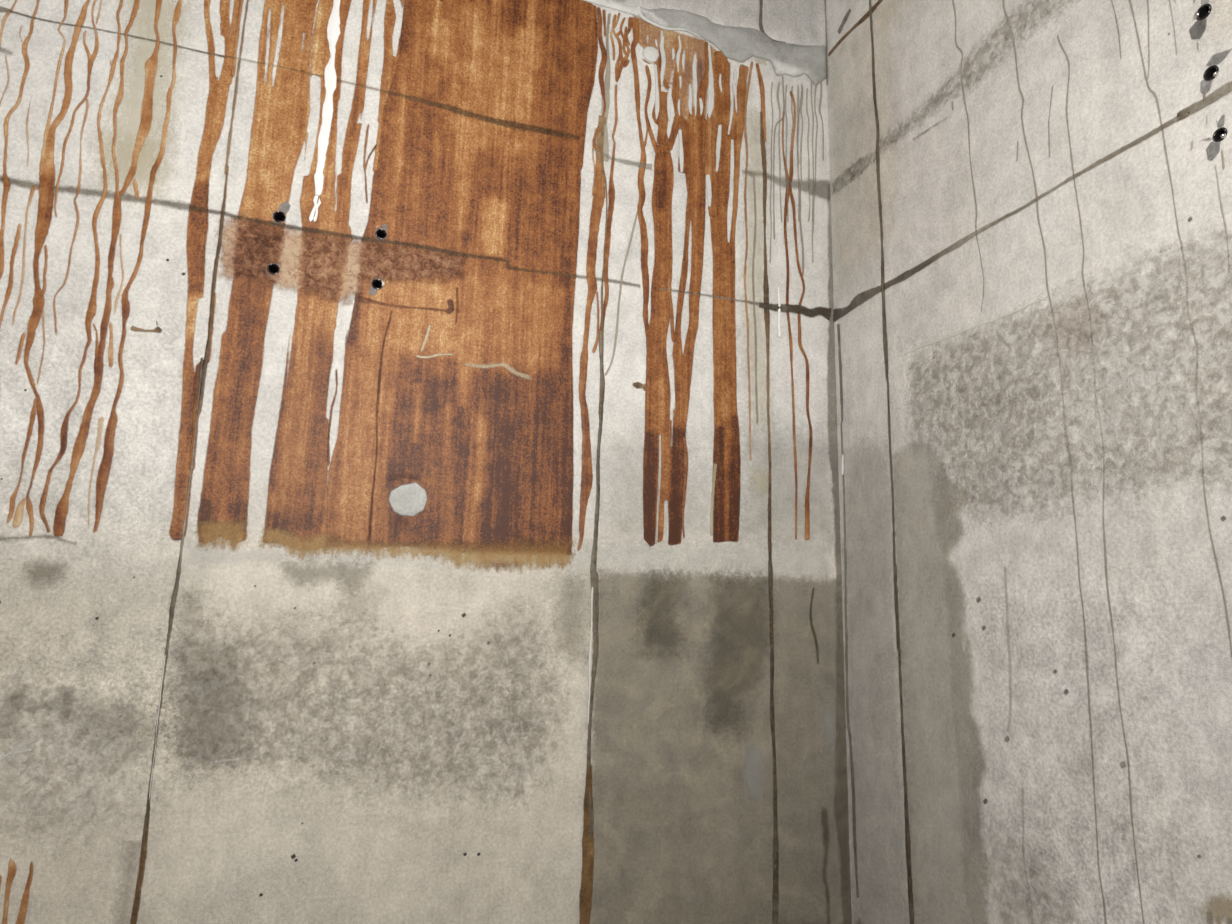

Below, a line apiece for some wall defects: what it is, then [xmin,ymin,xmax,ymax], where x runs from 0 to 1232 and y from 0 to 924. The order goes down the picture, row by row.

corrosion [0,0,182,537]
corrosion [169,0,277,549]
corrosion [238,0,749,570]
peeling [586,0,639,16]
damp [952,0,984,310]
damp [810,588,819,662]
corrosion [0,859,33,924]